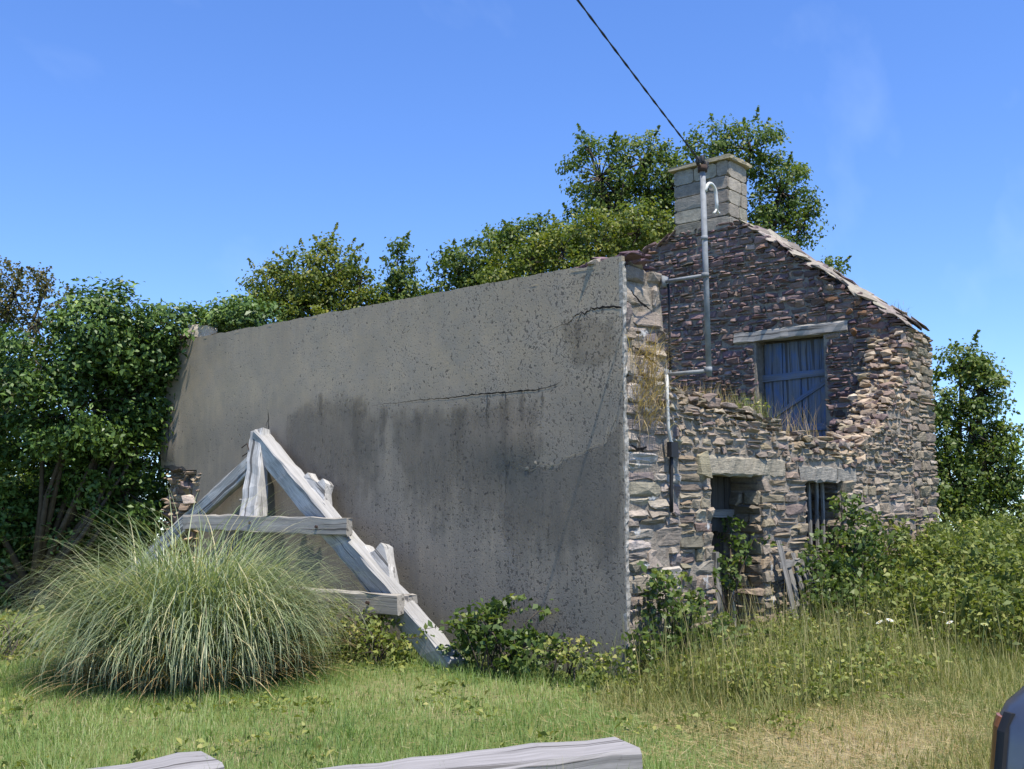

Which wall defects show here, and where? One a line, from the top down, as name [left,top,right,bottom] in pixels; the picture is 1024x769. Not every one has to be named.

crack [549,290,652,330]
damp [289,397,385,489]
damp [397,401,534,511]
crack [384,383,558,422]